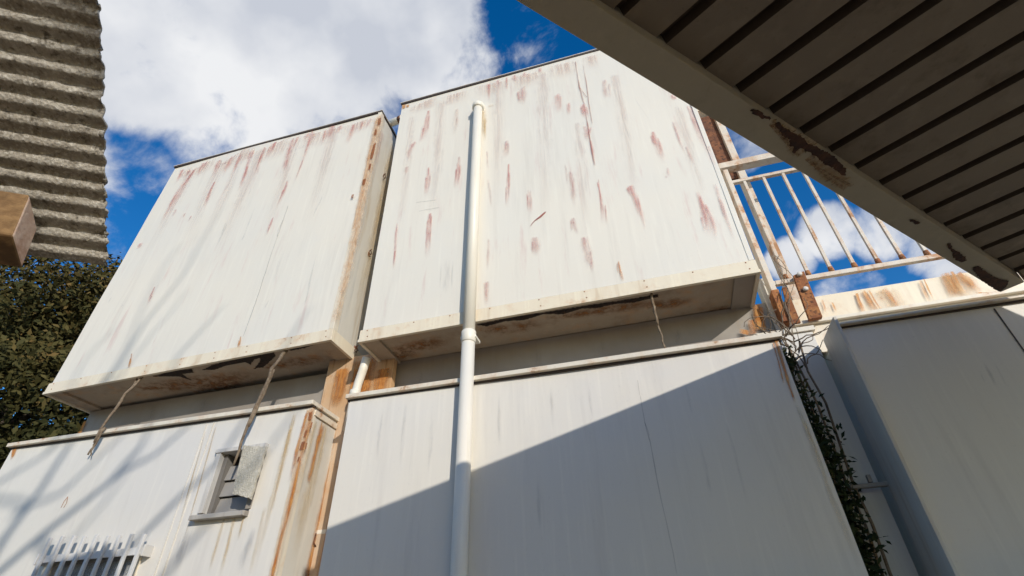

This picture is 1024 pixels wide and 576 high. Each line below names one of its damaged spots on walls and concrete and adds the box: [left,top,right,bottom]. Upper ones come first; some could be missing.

peeling [750,109,847,176]
corrosion [342,149,372,291]
peeling [947,243,1009,292]
spalling [477,294,658,326]
corrosion [856,290,896,309]
spalling [153,352,275,380]
corrosion [332,358,389,408]
corrosion [272,411,323,576]
corrosion [307,472,334,576]